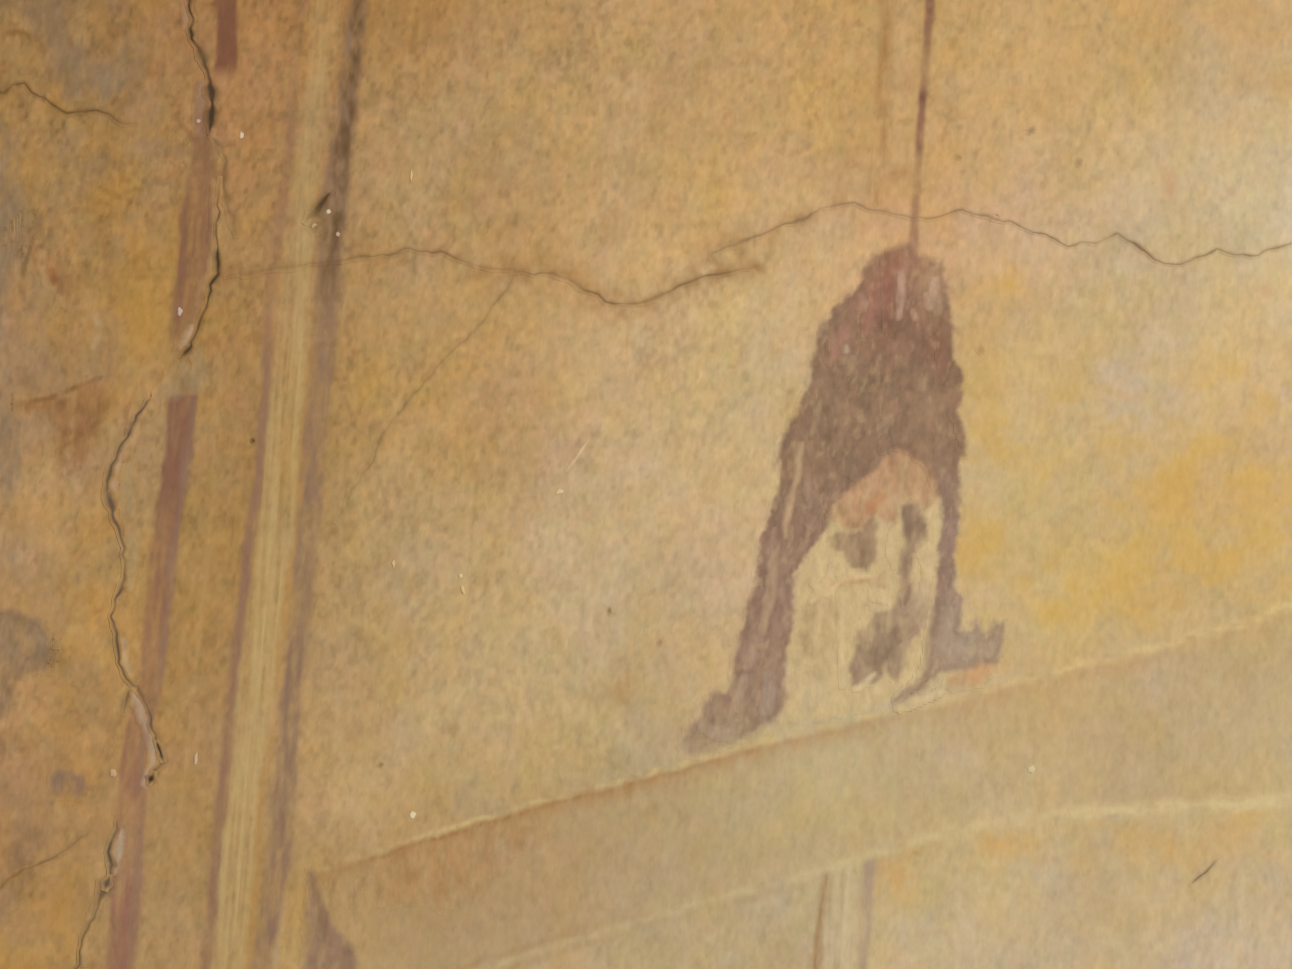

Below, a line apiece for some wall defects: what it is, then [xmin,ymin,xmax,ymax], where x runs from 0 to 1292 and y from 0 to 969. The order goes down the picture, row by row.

crack [0,79,139,128]
crack [176,0,1292,525]
crack [101,395,170,789]
crack [0,816,128,969]